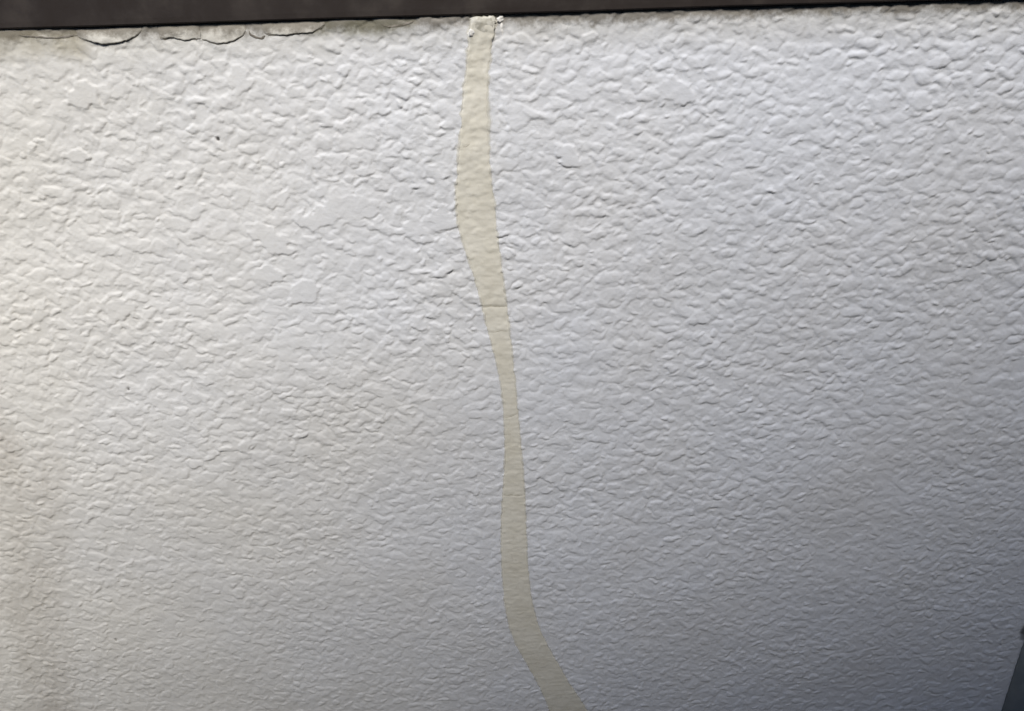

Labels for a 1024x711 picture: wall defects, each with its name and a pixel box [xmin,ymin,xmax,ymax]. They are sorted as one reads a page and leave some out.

crack [18,33,78,41]